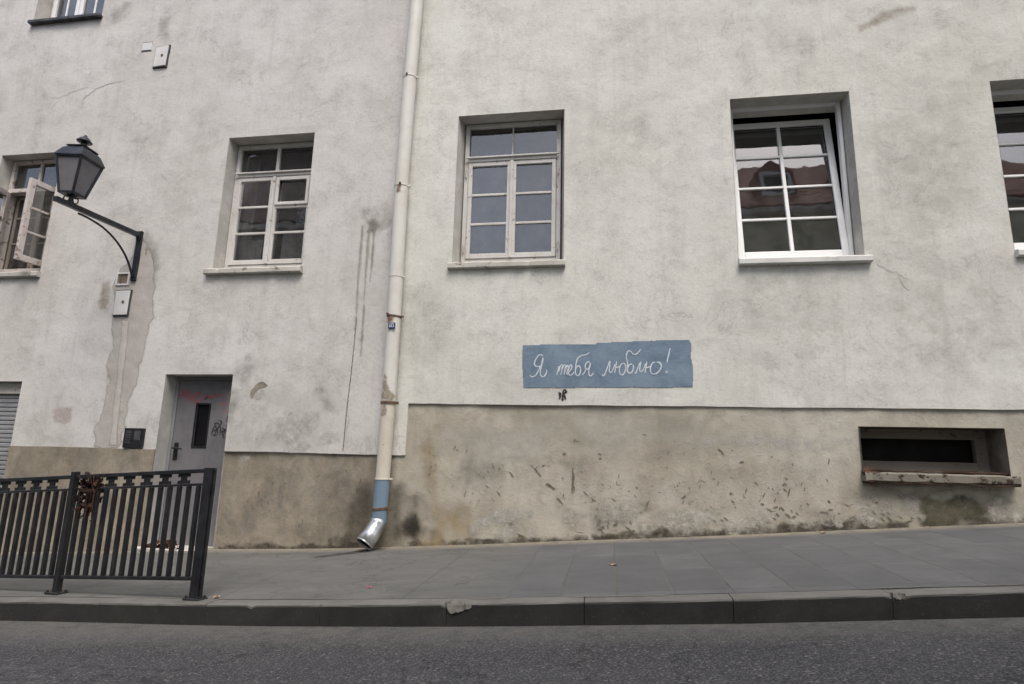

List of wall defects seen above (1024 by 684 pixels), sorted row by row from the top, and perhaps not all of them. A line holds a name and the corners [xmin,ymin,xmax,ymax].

water stain [360,220,376,277]
spalling [250,382,268,407]
peeling [382,375,395,415]
water stain [392,489,908,546]
water stain [922,503,1024,527]